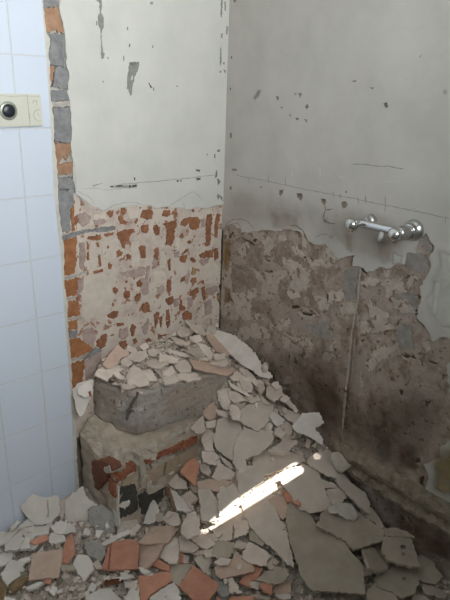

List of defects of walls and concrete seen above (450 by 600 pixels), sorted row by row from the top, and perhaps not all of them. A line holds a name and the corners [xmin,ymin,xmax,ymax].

spalling [43,0,223,389]
spalling [73,388,95,438]
spalling [220,224,450,581]